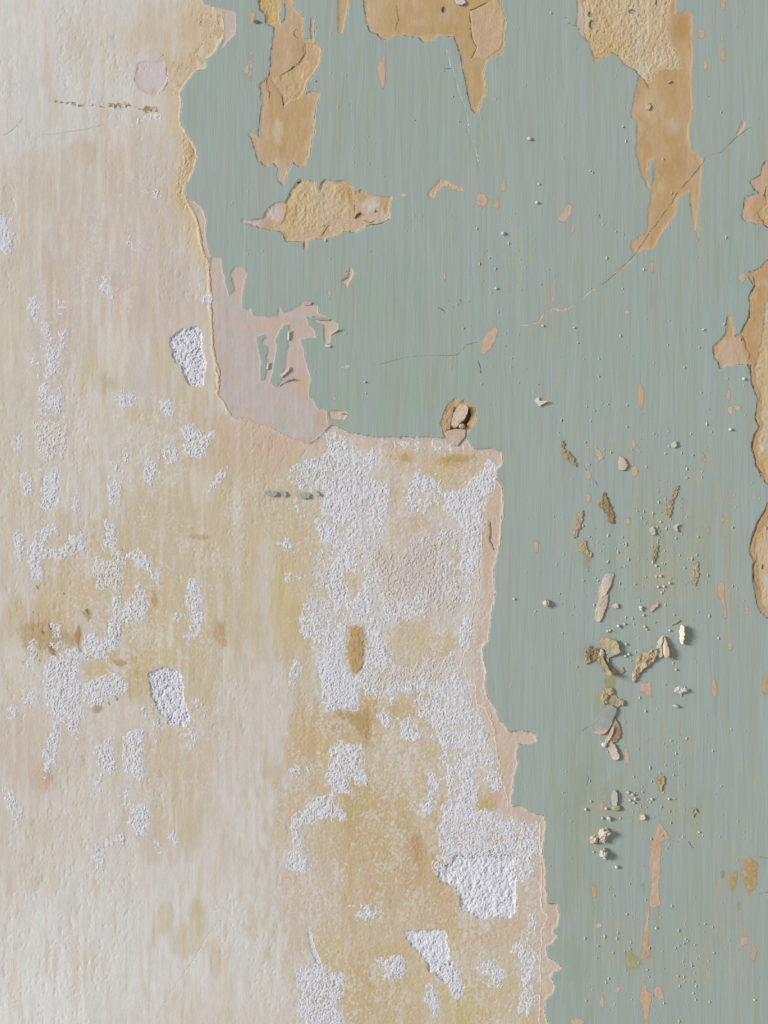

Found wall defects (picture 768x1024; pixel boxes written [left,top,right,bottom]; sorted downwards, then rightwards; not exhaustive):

peeling [241,0,407,249]
peeling [364,0,506,114]
crack [516,128,749,327]
peeling [574,0,707,273]
flaking render [12,294,85,581]
peeling [713,261,768,484]
flaking render [6,447,164,779]
flaking render [166,199,541,920]
damp [347,626,364,672]
peeling [745,503,768,618]
flaking render [91,667,220,876]
flaking render [404,913,540,1020]